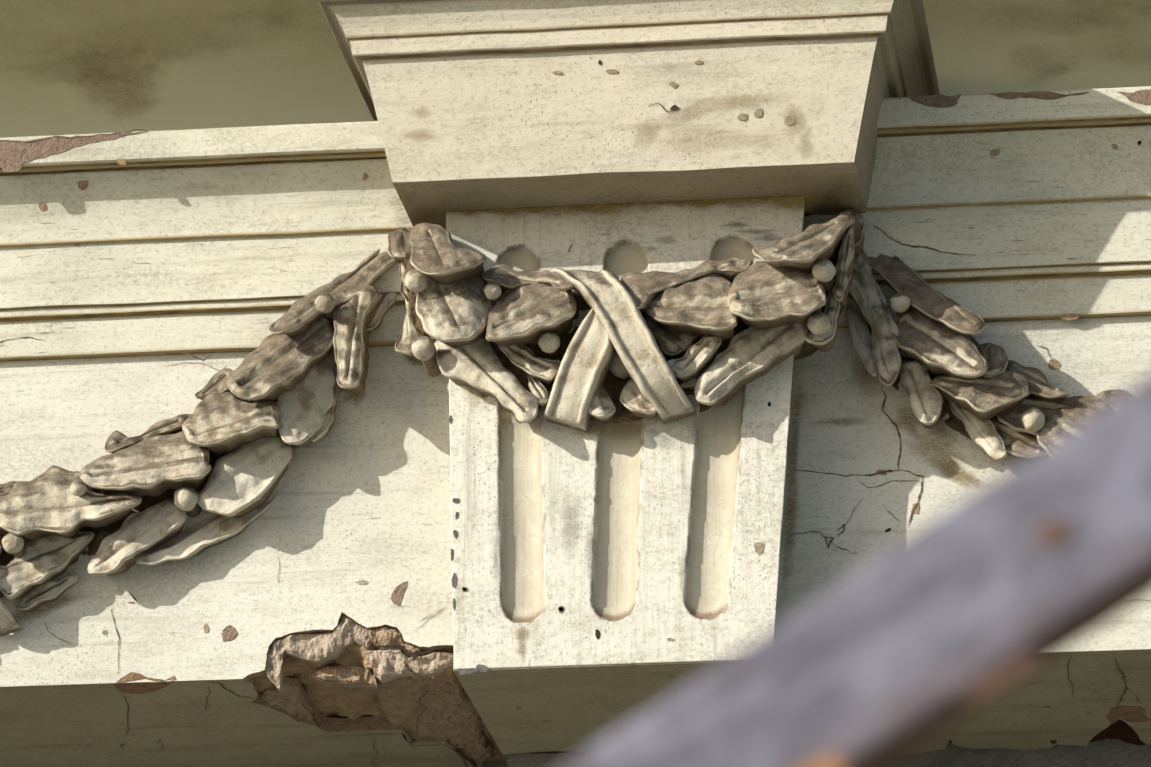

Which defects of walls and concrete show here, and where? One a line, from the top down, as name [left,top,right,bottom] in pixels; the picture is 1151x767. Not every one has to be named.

spalling [0,129,148,173]
crack [874,225,976,256]
crack [790,387,923,554]
spalling [255,614,515,767]
crack [1113,658,1141,709]
peeling [1106,706,1151,724]